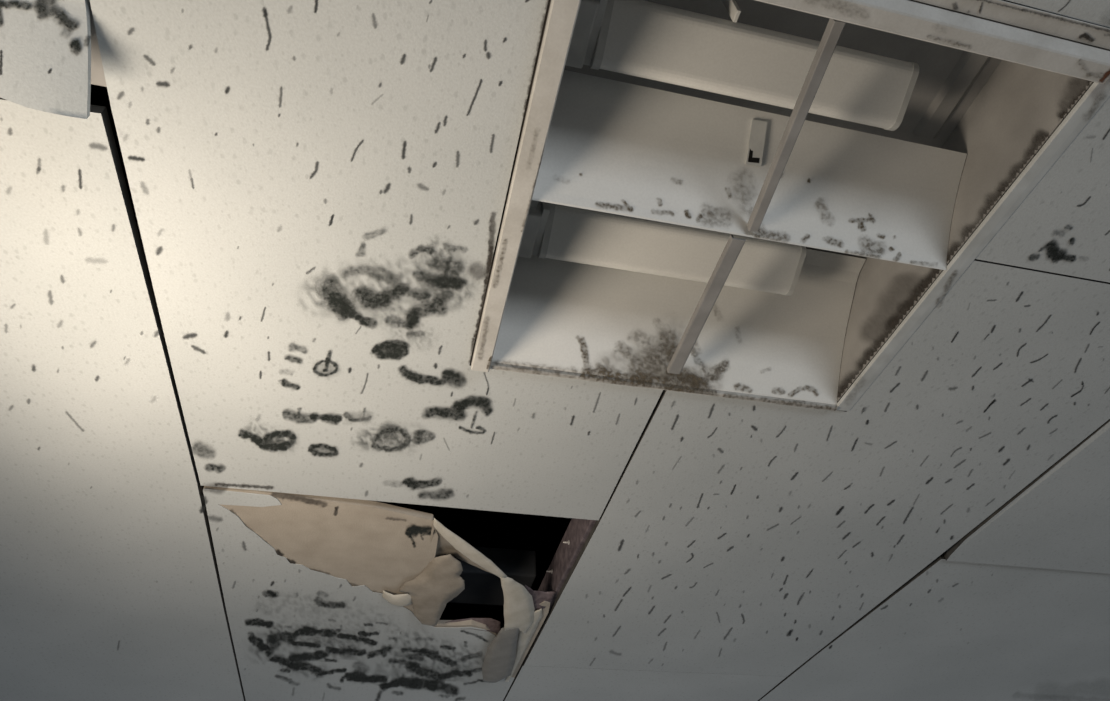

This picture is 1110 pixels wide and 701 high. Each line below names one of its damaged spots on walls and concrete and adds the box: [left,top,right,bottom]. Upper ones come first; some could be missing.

leakage [0,0,91,54]
leakage [1029,225,1075,262]
leakage [285,345,338,377]
leakage [321,246,492,434]
leakage [239,408,370,451]
leakage [362,427,434,452]
leakage [194,444,338,515]
leakage [402,478,452,499]
leakage [245,619,487,701]